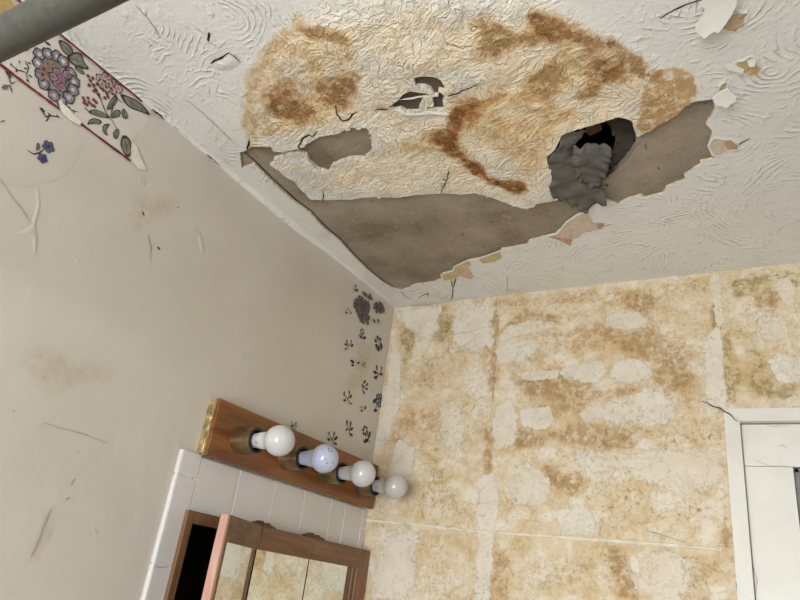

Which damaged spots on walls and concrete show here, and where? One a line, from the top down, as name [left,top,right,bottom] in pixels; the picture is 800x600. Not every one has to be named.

leakage [303,27,347,42]
leakage [481,24,539,55]
peeling [695,0,753,38]
leakage [610,44,658,78]
peeling [388,77,450,116]
leakage [578,86,599,100]
spalling [574,121,615,150]
flaking render [595,55,764,205]
flaking render [239,126,607,291]